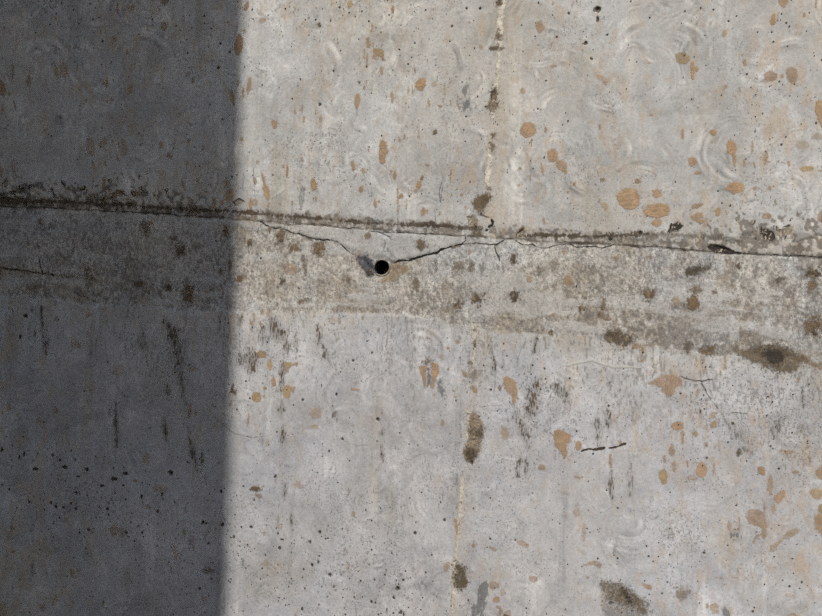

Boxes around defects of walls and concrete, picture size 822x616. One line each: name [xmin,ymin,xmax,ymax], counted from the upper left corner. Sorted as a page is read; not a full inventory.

crack [3,204,822,272]
crack [3,259,49,275]
leakage [738,343,822,375]
leakage [758,467,785,503]
leakage [811,489,822,534]
leakage [599,580,648,615]